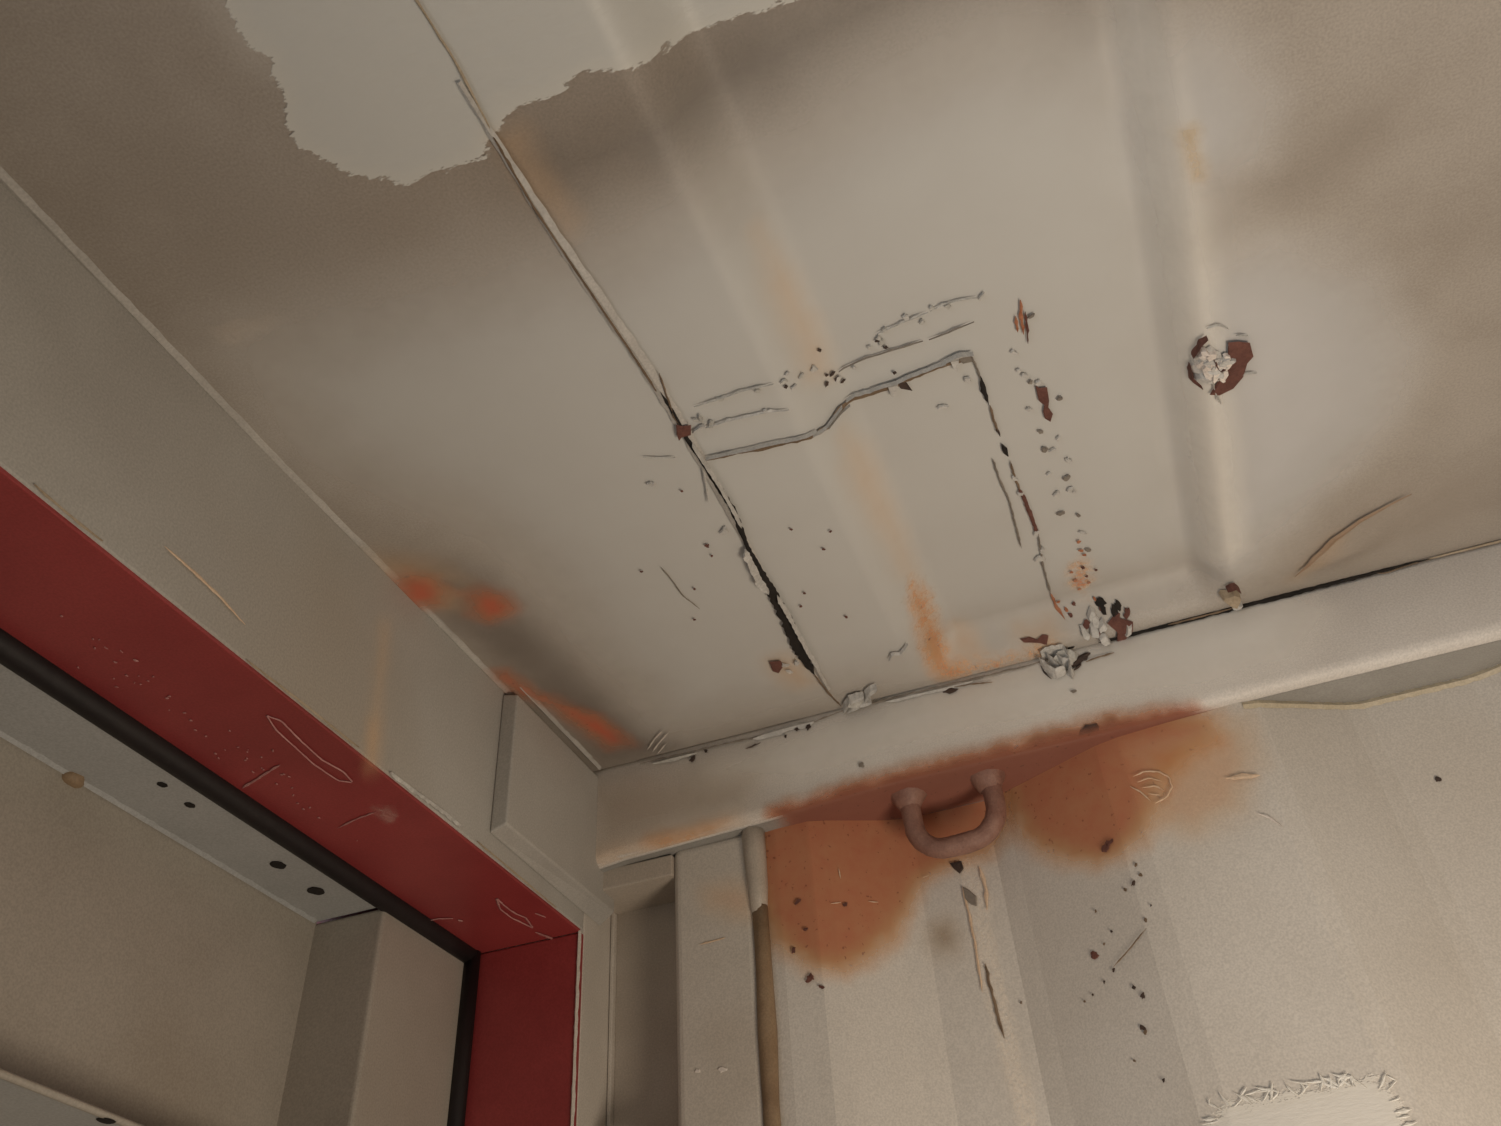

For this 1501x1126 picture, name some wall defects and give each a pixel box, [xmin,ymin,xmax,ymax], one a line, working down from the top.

crack [493,137,1501,764]
rust [391,565,518,623]
rust [495,670,648,751]
rust [765,705,1242,989]